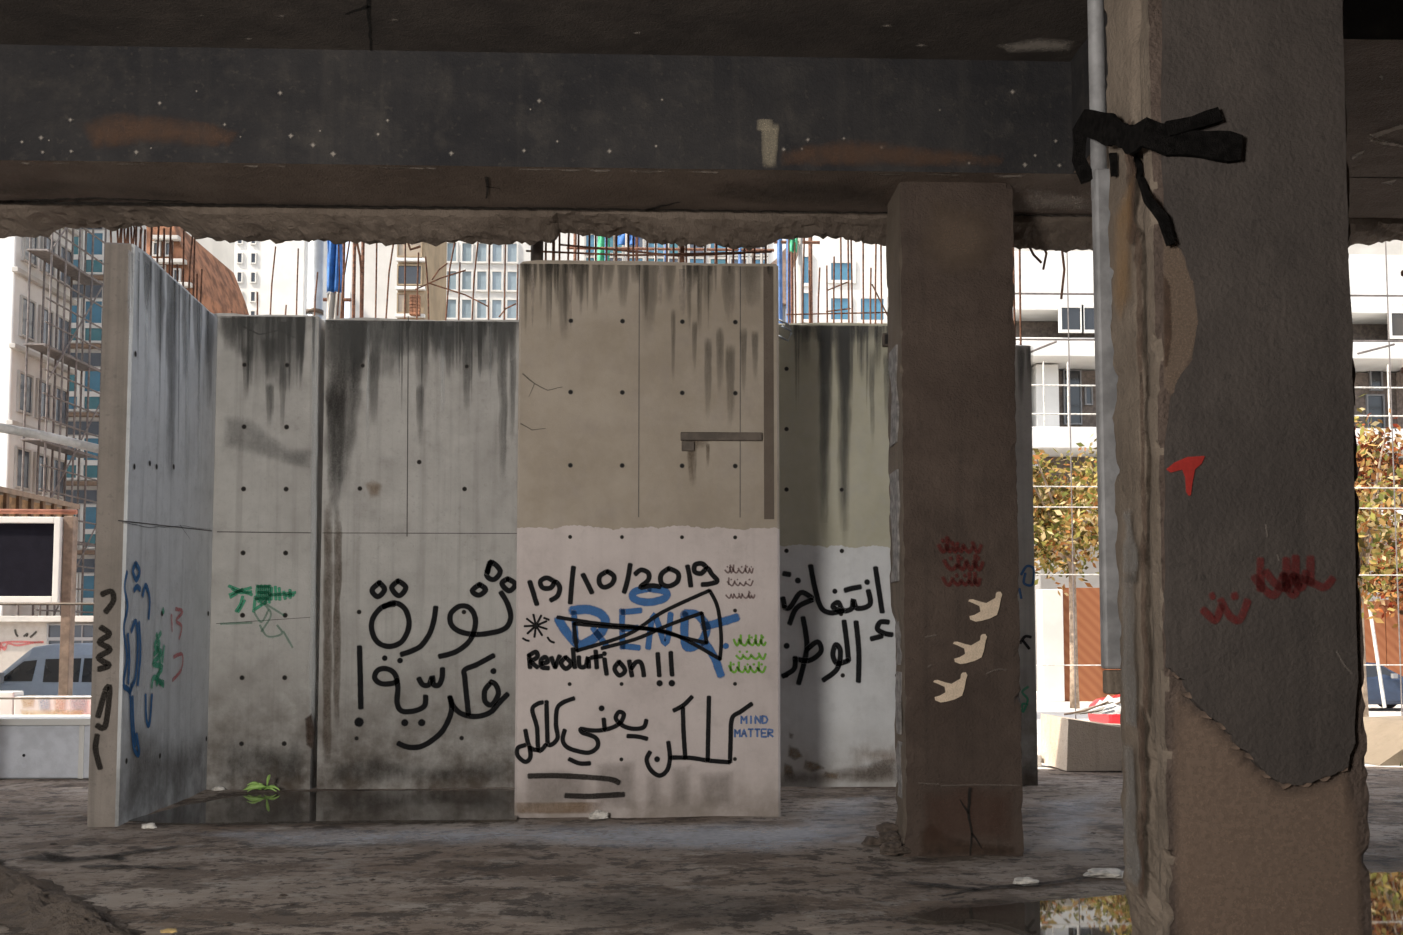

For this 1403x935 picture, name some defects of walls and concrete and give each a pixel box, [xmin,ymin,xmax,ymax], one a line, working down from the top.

crack [346,0,372,51]
spalling [545,233,767,264]
damp [796,325,882,444]
damp [128,247,515,739]